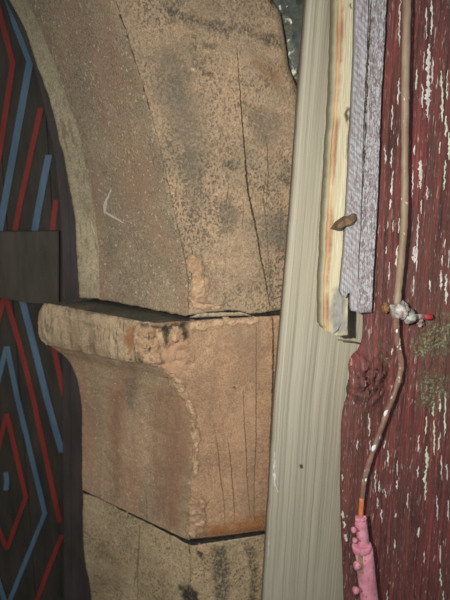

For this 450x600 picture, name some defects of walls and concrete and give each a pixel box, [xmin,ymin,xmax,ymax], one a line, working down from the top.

peeling [415,0,450,190]
spalling [188,255,221,310]
crack [215,55,281,520]
peeling [384,134,399,210]
peeling [411,146,428,296]
peeling [439,239,450,304]
spalling [133,325,201,477]
peeling [416,393,448,500]
water stain [179,585,198,600]
water stain [213,547,229,600]